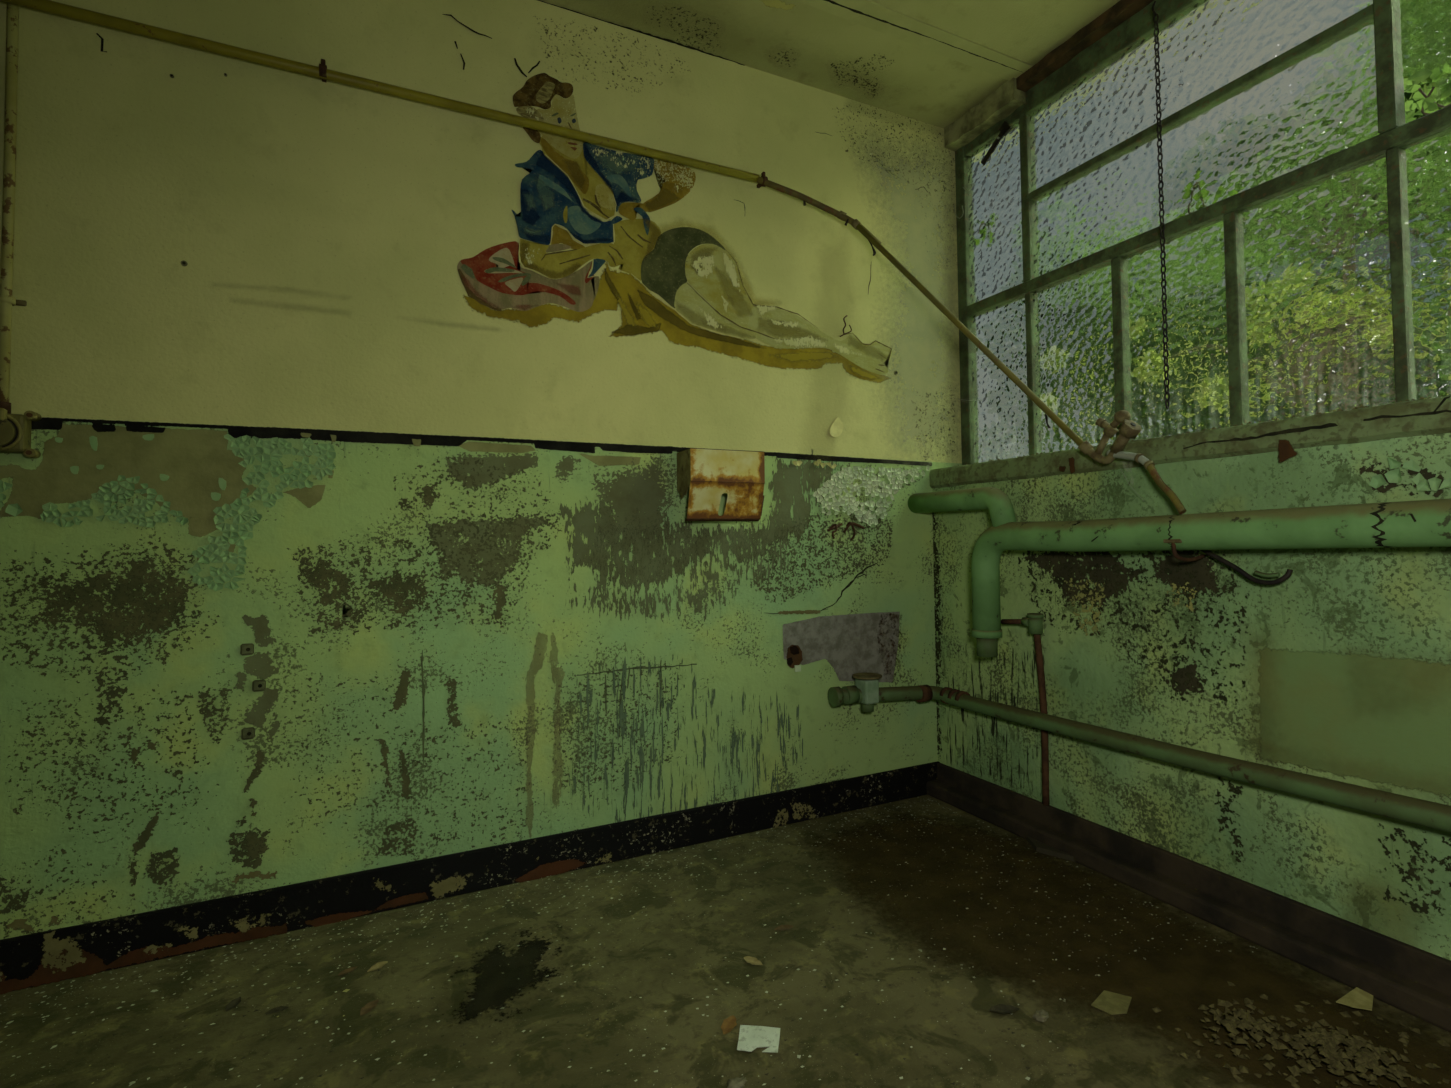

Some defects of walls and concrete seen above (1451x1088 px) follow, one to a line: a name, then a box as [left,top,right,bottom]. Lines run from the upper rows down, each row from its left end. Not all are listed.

peeling [1018,550,1251,705]
peeling [0,424,686,995]
damp [525,633,803,837]
peeling [1214,777,1244,862]
peeling [1378,823,1451,916]
damp [443,924,568,1024]